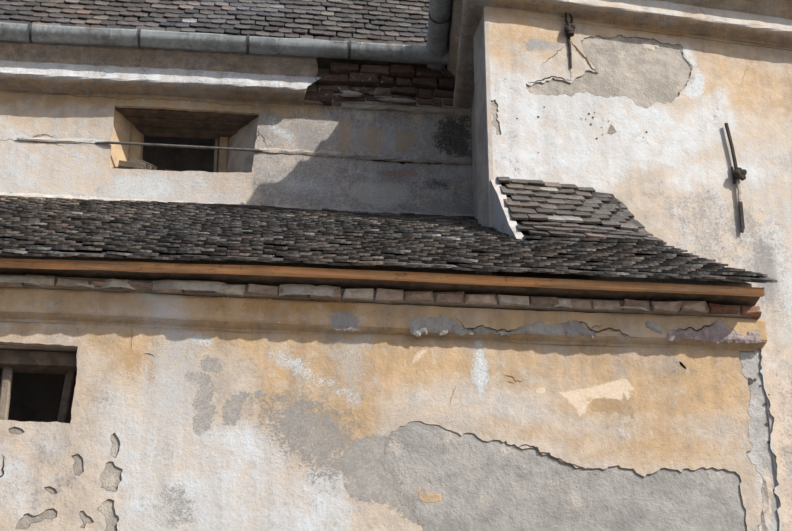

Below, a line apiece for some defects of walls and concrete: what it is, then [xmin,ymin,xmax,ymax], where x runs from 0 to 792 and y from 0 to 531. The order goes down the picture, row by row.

crack [544,43,596,78]
flaking render [526,34,701,108]
mould [431,114,472,159]
leakage [753,208,792,352]
flaking render [16,508,58,529]
flaking render [72,454,84,476]
flaking render [80,510,94,528]
flaking render [98,433,123,531]
flaking render [183,354,747,531]
flaking render [739,348,781,531]